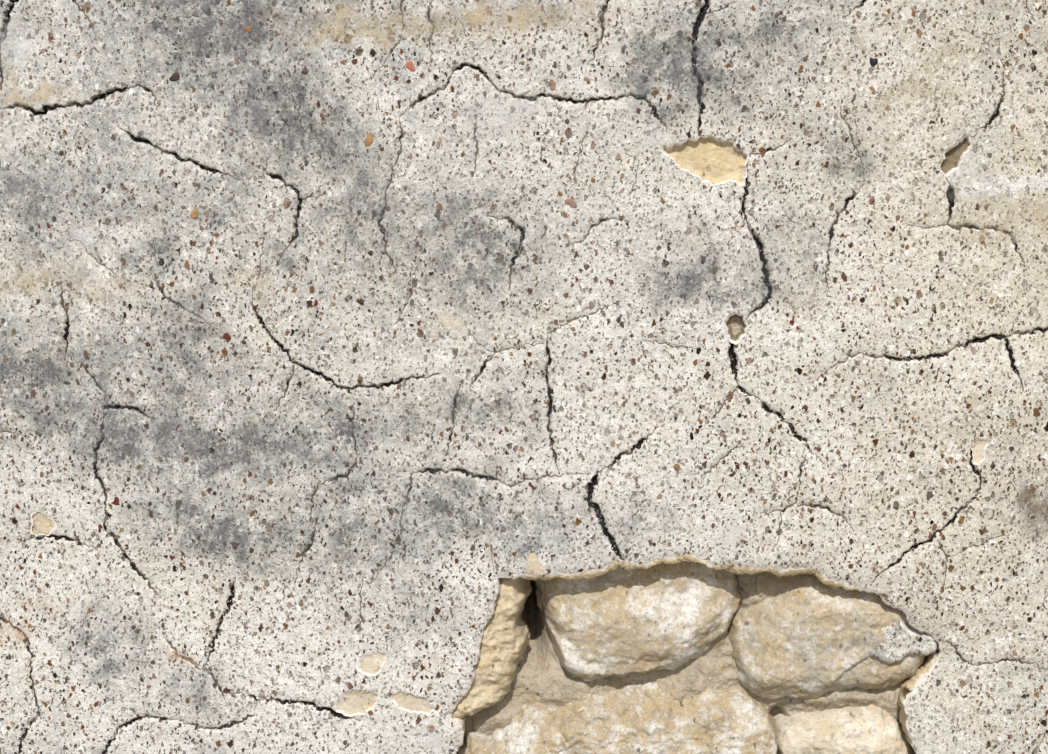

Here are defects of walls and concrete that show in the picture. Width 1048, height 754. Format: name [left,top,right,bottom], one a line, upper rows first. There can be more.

crack [0,0,239,180]
crack [373,0,667,324]
spalling [661,135,749,187]
spalling [939,135,972,177]
spalling [30,510,58,537]
crack [17,283,161,597]
crack [251,167,658,631]
crack [711,343,853,551]
crack [816,328,1048,391]
crack [102,576,360,754]
spalling [335,689,435,717]
flaking render [450,553,943,754]